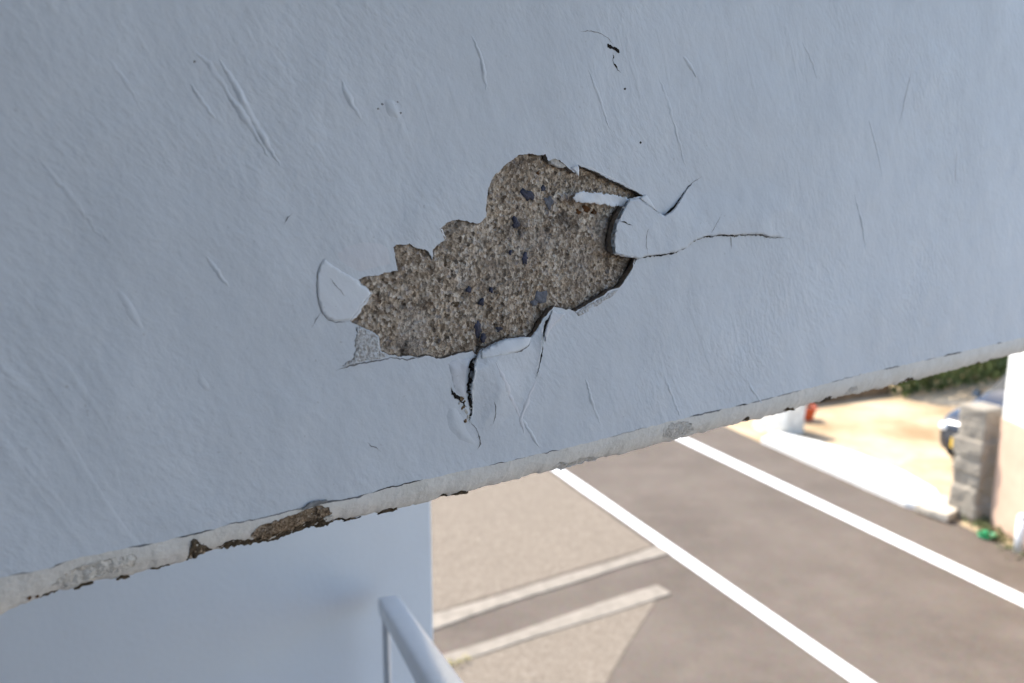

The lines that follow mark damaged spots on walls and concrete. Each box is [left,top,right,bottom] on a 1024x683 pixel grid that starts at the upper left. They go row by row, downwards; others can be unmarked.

crack [640,177,701,215]
crack [637,216,779,260]
spalling [313,153,643,433]
crack [448,358,558,466]
crack [691,390,800,417]
spalling [186,499,361,561]
crack [177,480,420,538]